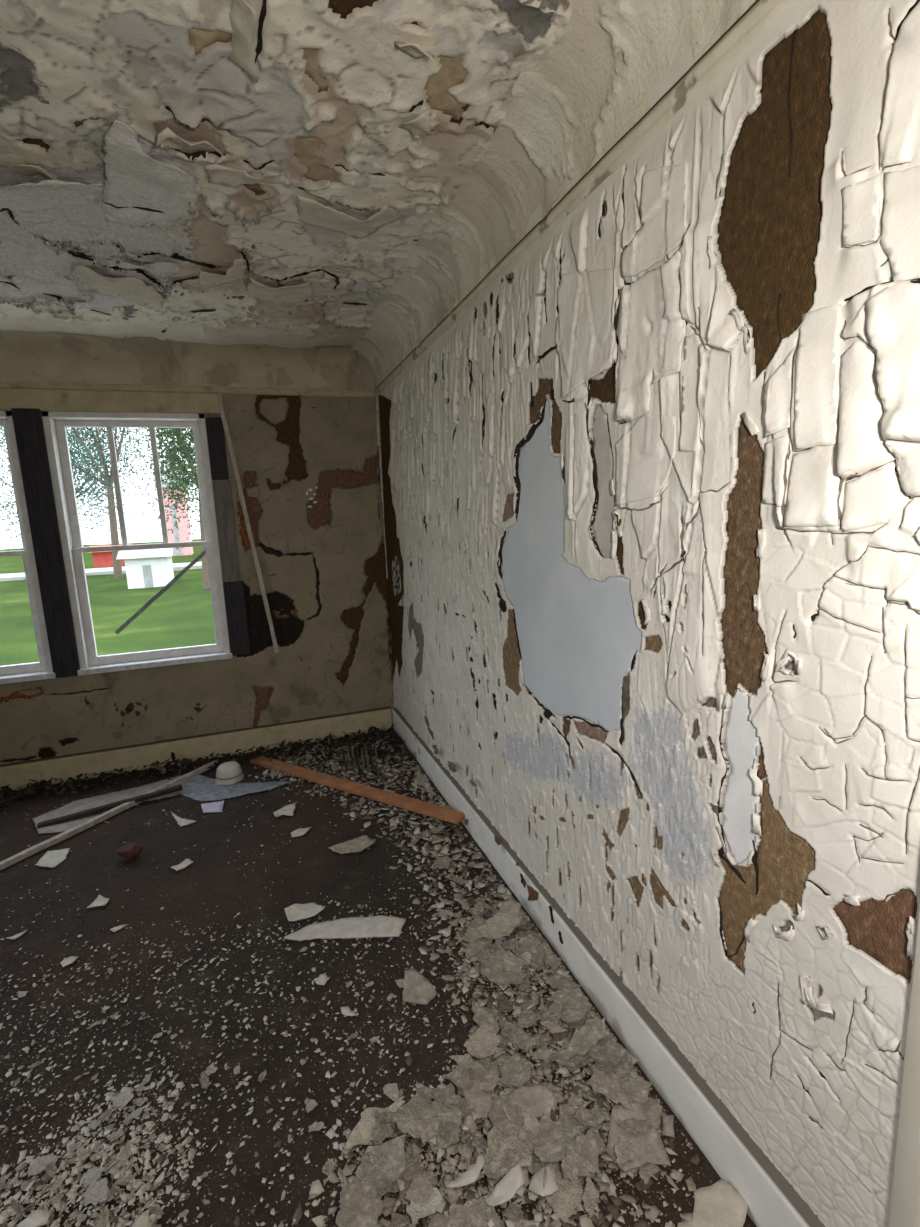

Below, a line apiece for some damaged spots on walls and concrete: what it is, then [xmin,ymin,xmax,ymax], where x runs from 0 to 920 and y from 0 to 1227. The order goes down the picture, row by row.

peeling [328,0,378,19]
crack [888,0,920,56]
peeling [0,105,314,320]
crack [598,168,643,250]
crack [840,133,920,358]
peeling [237,394,424,690]
peeling [483,162,702,778]
peeling [692,9,920,983]
crack [717,709,759,895]
peeling [606,864,700,931]
crack [718,898,745,958]
crack [752,981,904,1129]